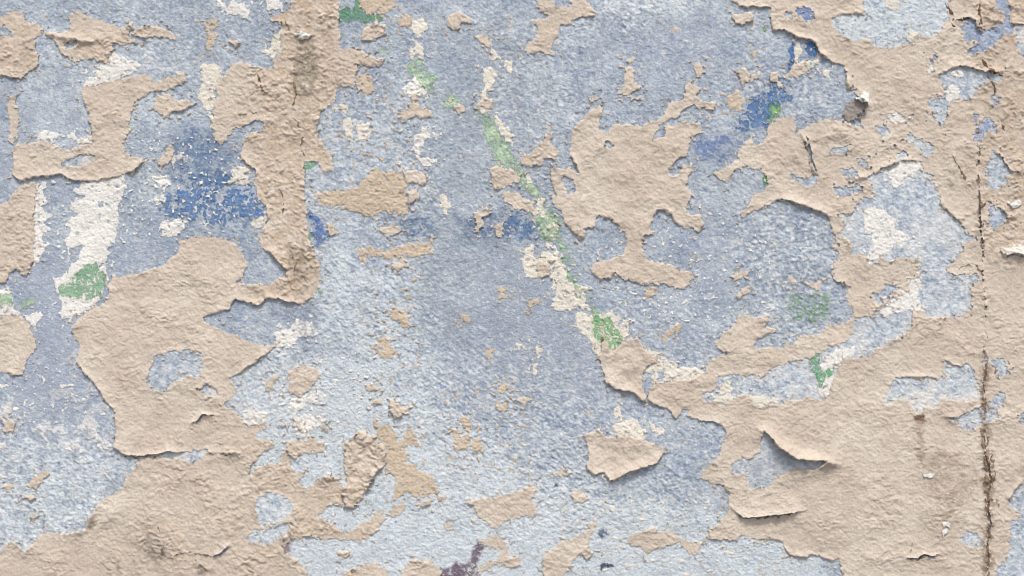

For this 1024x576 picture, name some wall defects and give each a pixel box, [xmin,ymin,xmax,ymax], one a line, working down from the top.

peeling [0,0,455,576]
peeling [464,0,1024,576]
crack [932,113,1005,576]
crack [982,59,1003,94]